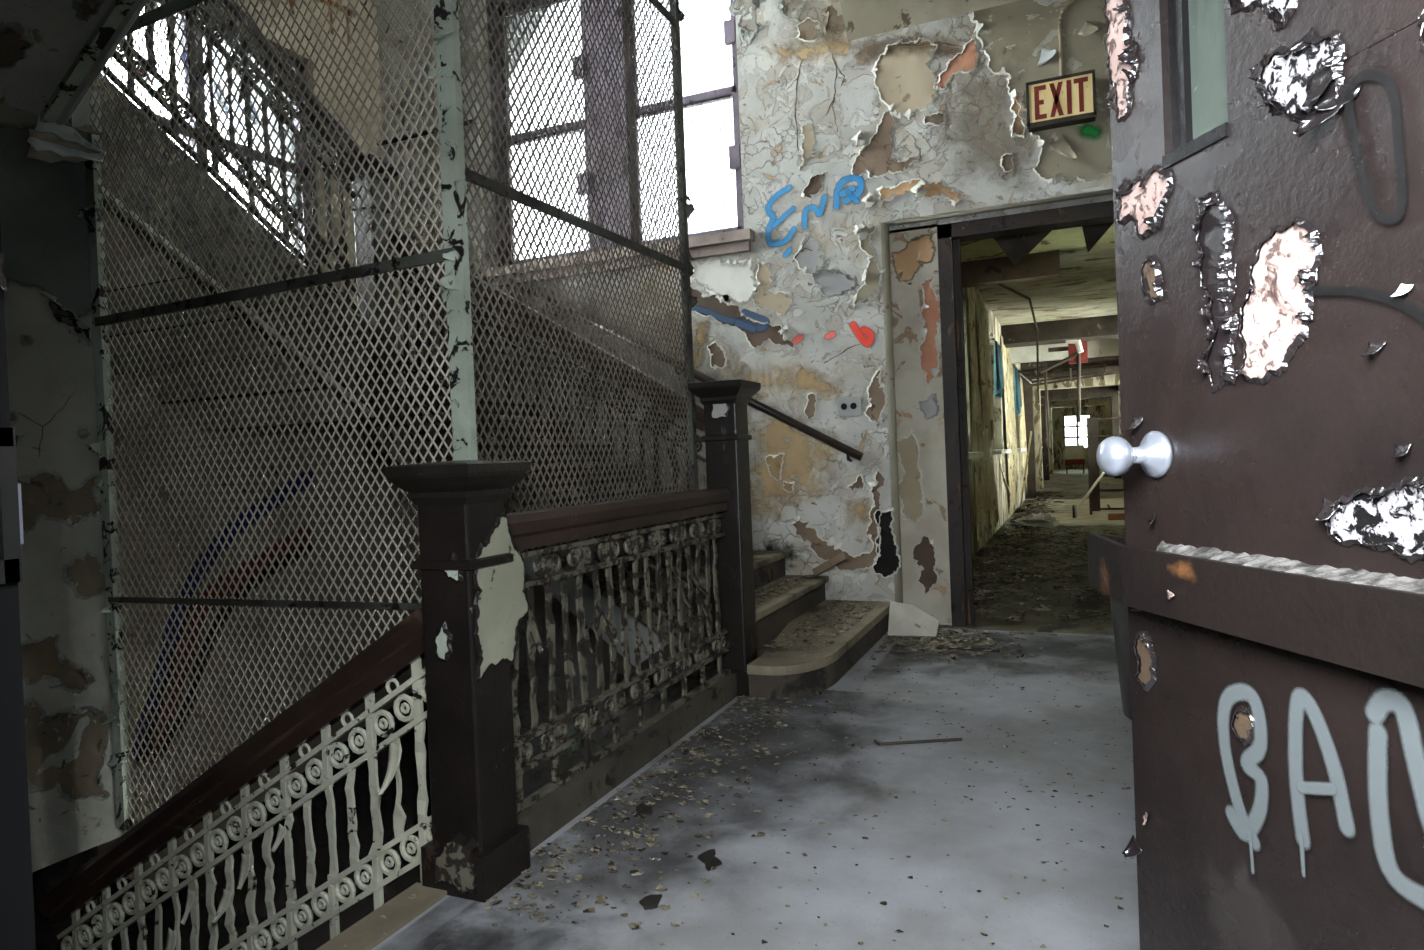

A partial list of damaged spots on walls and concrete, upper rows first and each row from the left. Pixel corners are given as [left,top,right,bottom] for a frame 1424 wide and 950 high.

peeling [728,0,845,44]
peeling [1228,0,1362,138]
peeling [1415,6,1424,55]
peeling [793,0,1173,424]
peeling [686,249,796,370]
peeling [1190,191,1323,393]
peeling [710,402,730,420]
peeling [1392,443,1412,459]
flaking render [790,430,939,595]
peeling [1313,476,1424,564]
peeling [433,621,453,662]
peeling [442,511,530,682]